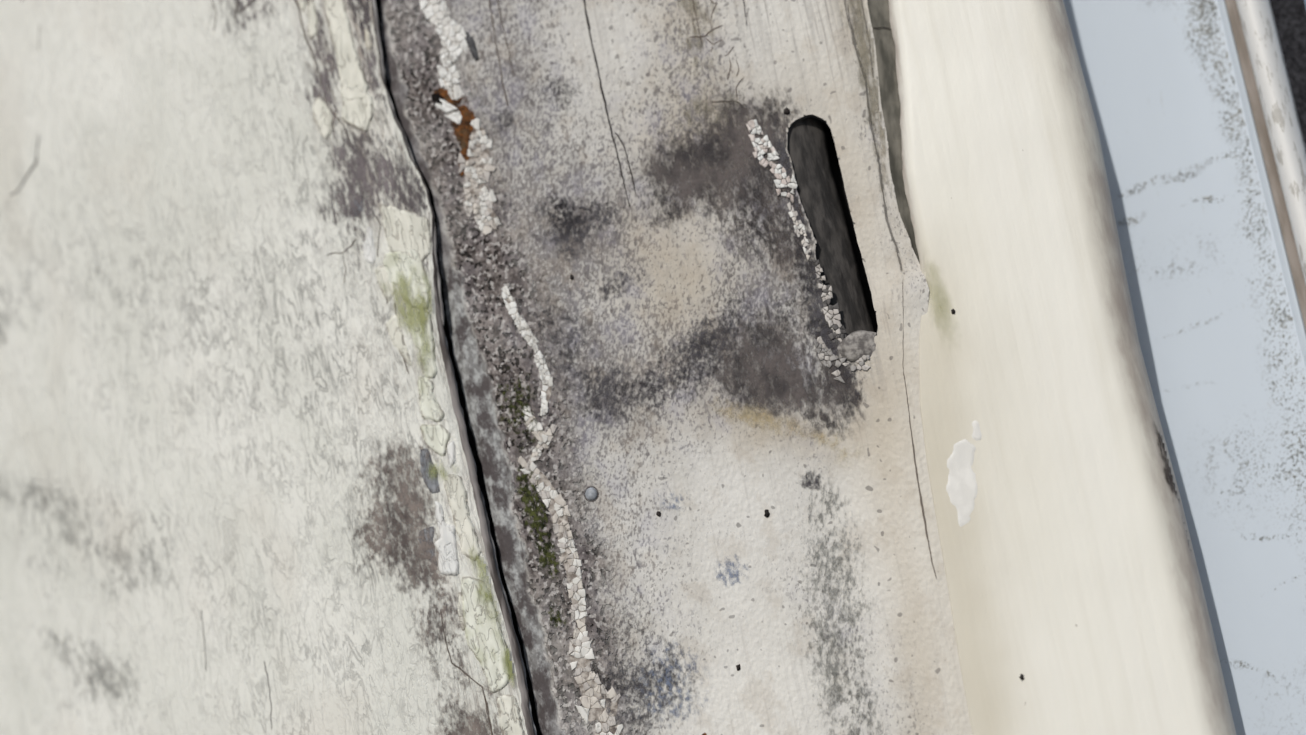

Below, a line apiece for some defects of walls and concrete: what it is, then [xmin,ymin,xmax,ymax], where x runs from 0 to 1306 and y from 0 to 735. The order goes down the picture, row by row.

leakage [227,0,266,31]
crack [328,215,397,315]
leakage [306,0,430,231]
peeling [298,0,535,735]
rust [431,88,476,177]
crack [372,0,541,735]
leakage [542,199,616,256]
crack [583,0,636,207]
leakage [578,97,861,428]
leakage [1188,0,1263,243]
leakage [360,443,458,653]
peeling [946,420,982,527]